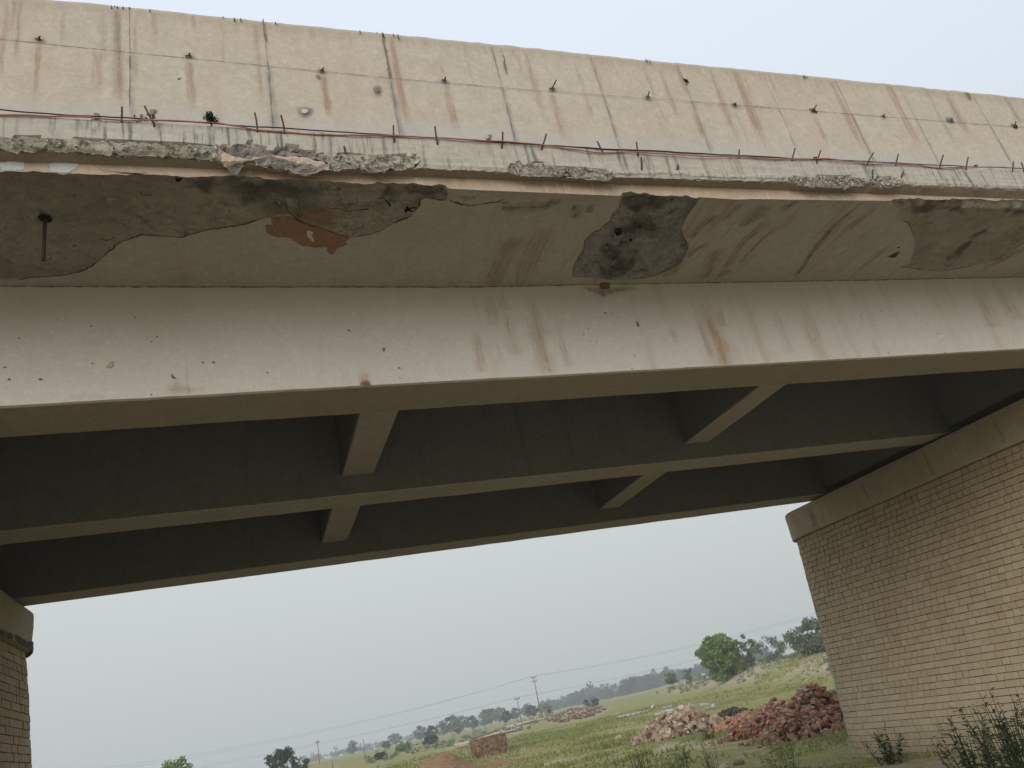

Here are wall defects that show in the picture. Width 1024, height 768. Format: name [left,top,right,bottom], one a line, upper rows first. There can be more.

spalling [0,112,449,280]
spalling [507,133,1024,280]